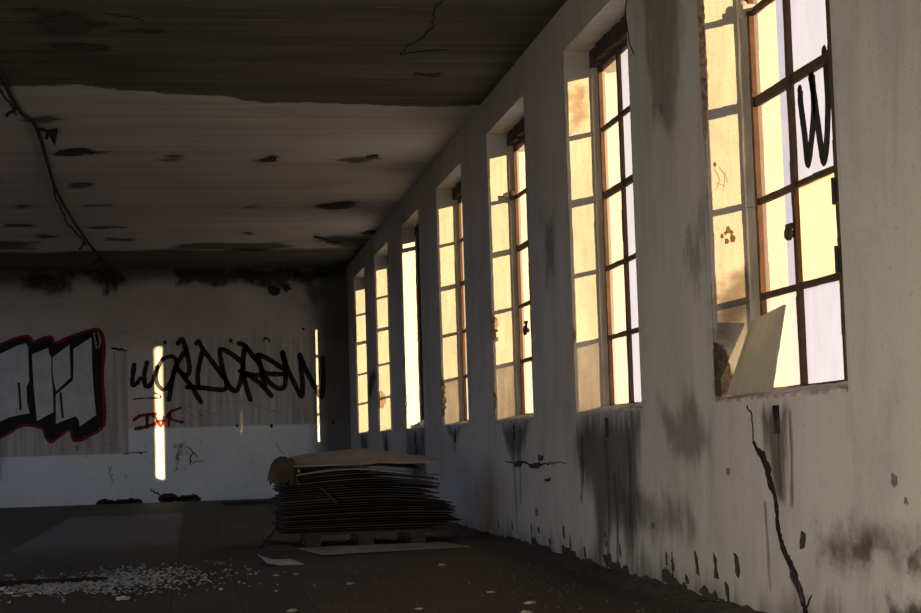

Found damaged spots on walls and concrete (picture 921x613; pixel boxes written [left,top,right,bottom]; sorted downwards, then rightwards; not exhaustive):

crack [400,0,448,55]
flaking render [697,0,708,139]
crack [505,454,565,482]
water stain [577,415,639,562]
crack [746,406,812,613]